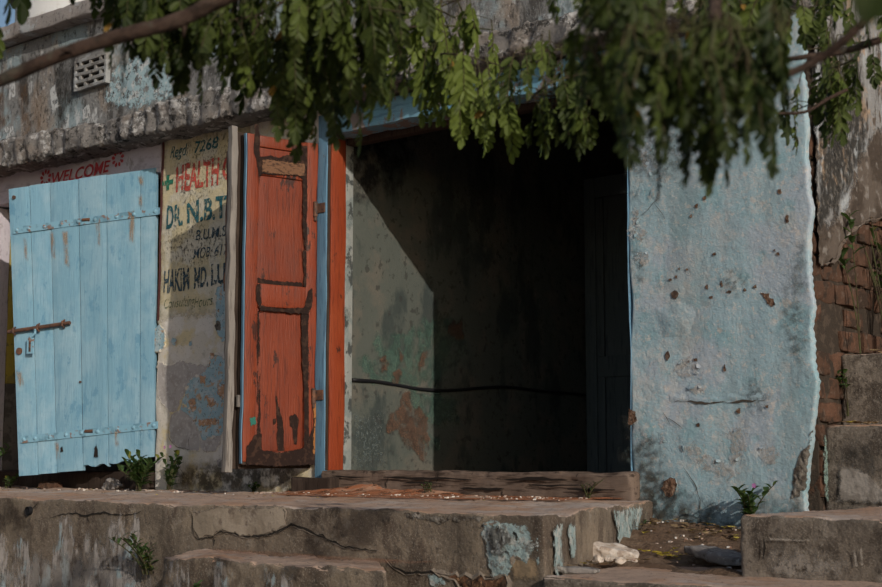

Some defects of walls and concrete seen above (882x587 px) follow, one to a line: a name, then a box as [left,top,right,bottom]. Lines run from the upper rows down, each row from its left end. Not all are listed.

peeling [105,57,179,110]
peeling [215,283,225,342]
peeling [743,284,776,307]
peeling [155,324,225,467]
flaking render [661,477,678,497]
peeling [839,467,882,503]
crack [191,514,447,576]
peeling [404,511,540,587]